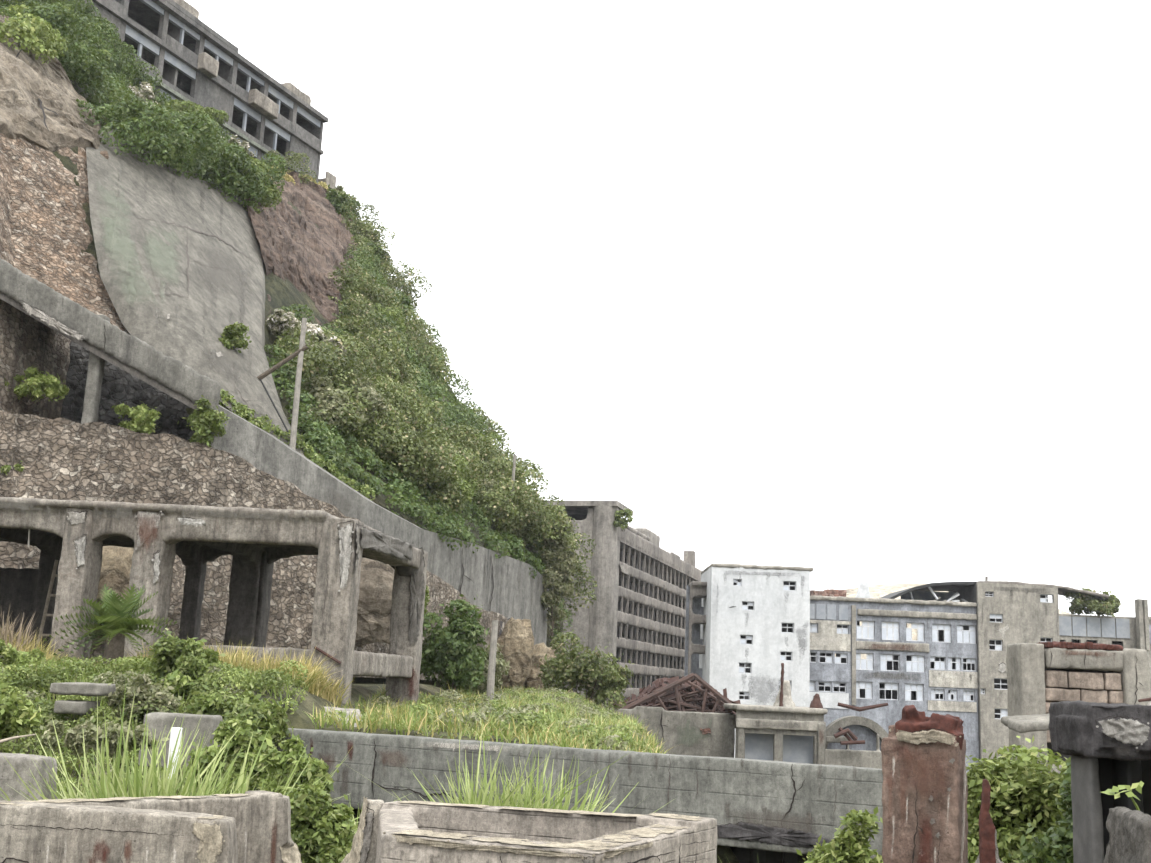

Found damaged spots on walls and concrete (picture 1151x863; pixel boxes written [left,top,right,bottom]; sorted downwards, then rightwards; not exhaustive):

spalling [0,793,250,812]
crack [782,766,805,820]
spalling [173,815,225,863]
spalling [280,843,302,863]
spalling [341,797,374,863]